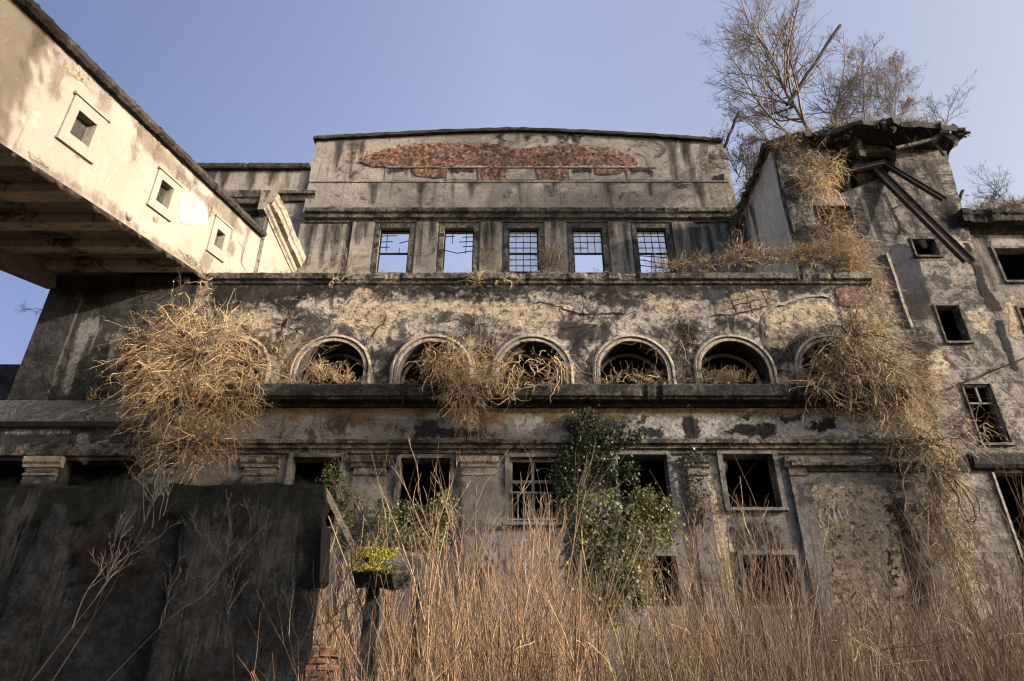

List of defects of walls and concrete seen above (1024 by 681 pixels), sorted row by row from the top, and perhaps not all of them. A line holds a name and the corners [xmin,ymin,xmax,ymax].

leakage [336,141,365,170]
leakage [448,168,474,192]
spalling [360,142,638,180]
leakage [629,168,653,195]
leakage [666,141,705,206]
leakage [980,235,995,289]
crack [528,291,636,330]
flaking render [712,286,869,350]
leakage [906,292,934,319]